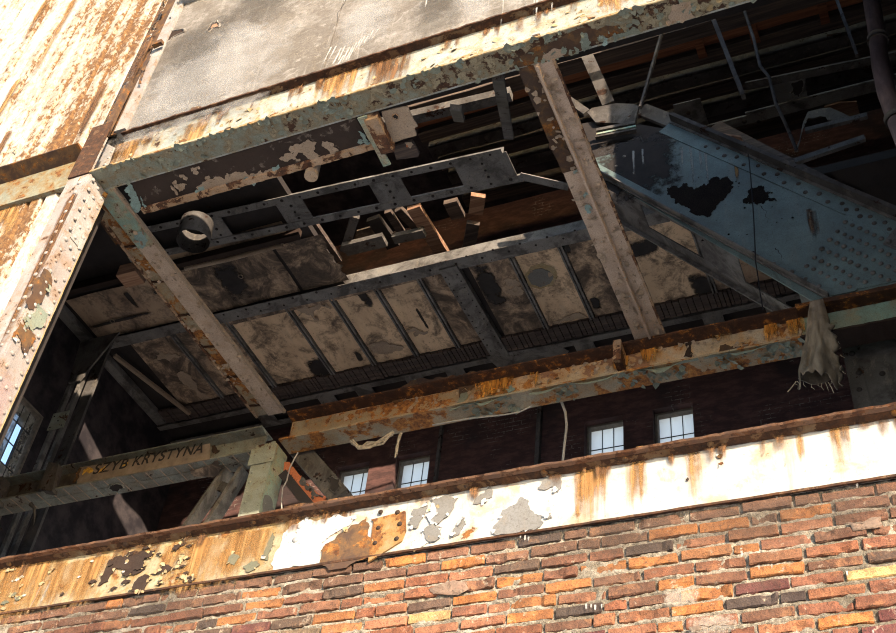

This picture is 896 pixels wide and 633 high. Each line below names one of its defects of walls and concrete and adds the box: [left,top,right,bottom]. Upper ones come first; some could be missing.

rust [39,0,75,64]
rust [80,85,106,131]
peeling [492,0,736,175]
peeling [100,89,353,213]
rust [4,194,77,335]
peeling [12,268,53,355]
rust [630,461,645,496]
peeling [408,494,466,551]
peeling [491,497,552,536]
rust [0,543,143,611]
peeling [77,536,196,594]
rust [157,526,269,592]